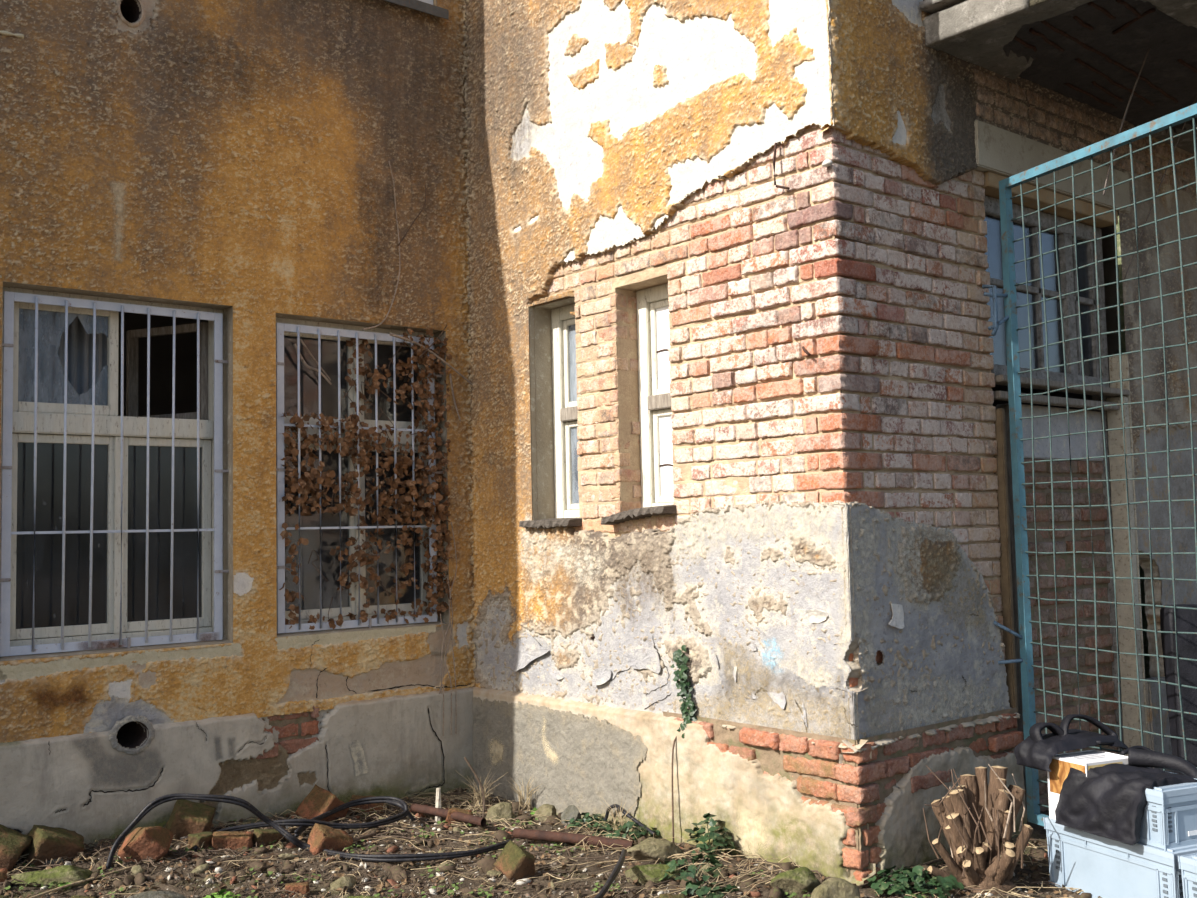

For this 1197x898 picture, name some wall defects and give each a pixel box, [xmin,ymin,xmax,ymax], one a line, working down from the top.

spalling [113,0,158,33]
crack [827,0,835,120]
flaking render [456,0,1024,888]
crack [55,767,163,813]
peeling [111,651,447,874]
spalling [258,873,310,895]